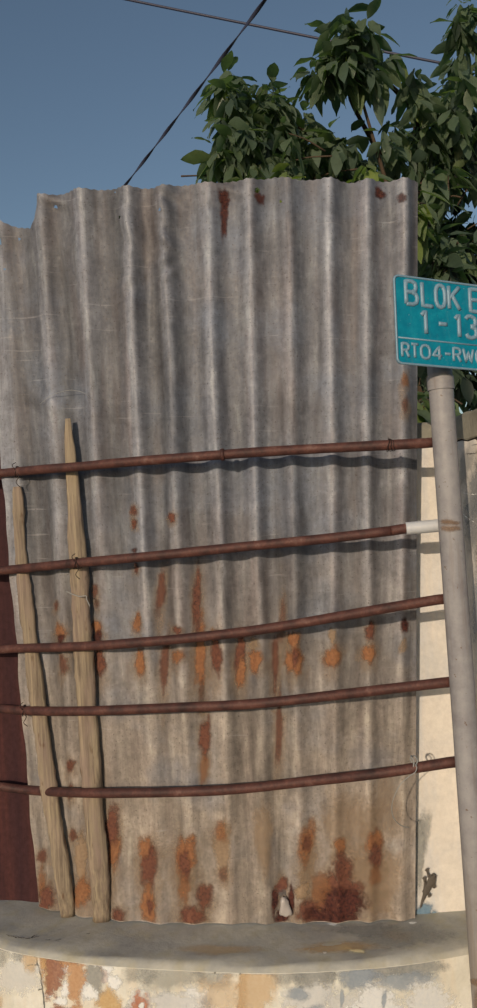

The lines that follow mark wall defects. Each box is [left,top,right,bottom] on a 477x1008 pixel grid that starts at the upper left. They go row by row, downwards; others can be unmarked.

corrosion [219,191,230,235]
corrosion [0,519,439,575]
corrosion [0,570,450,761]
corrosion [0,756,455,869]
corrosion [139,838,157,922]
corrosion [176,836,213,924]
corrosion [272,838,364,923]
peeling [44,959,229,1008]
peeling [280,980,456,1008]